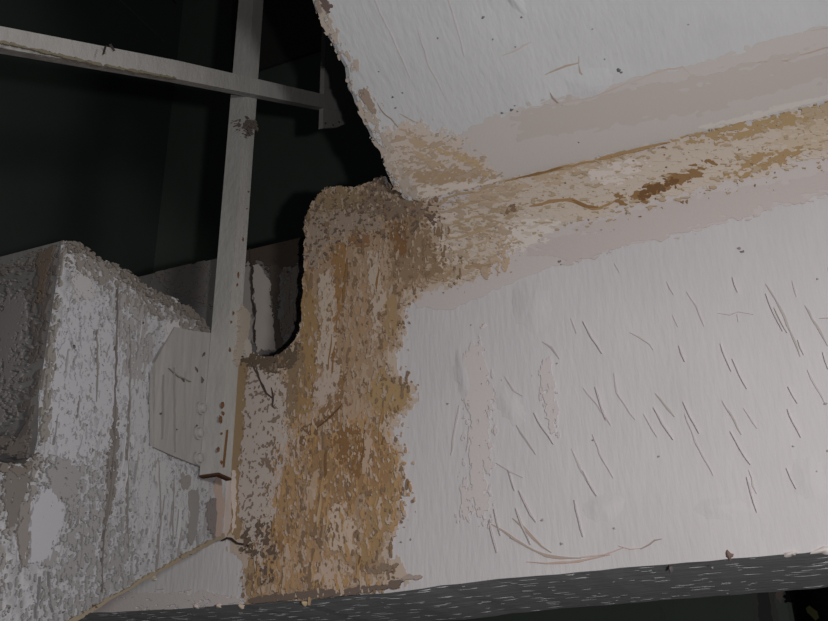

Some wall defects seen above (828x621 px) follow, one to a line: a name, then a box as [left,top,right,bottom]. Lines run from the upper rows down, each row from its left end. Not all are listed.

peeling [0,240,288,621]
damp [92,197,389,613]
spalling [359,88,377,114]
damp [313,0,828,599]